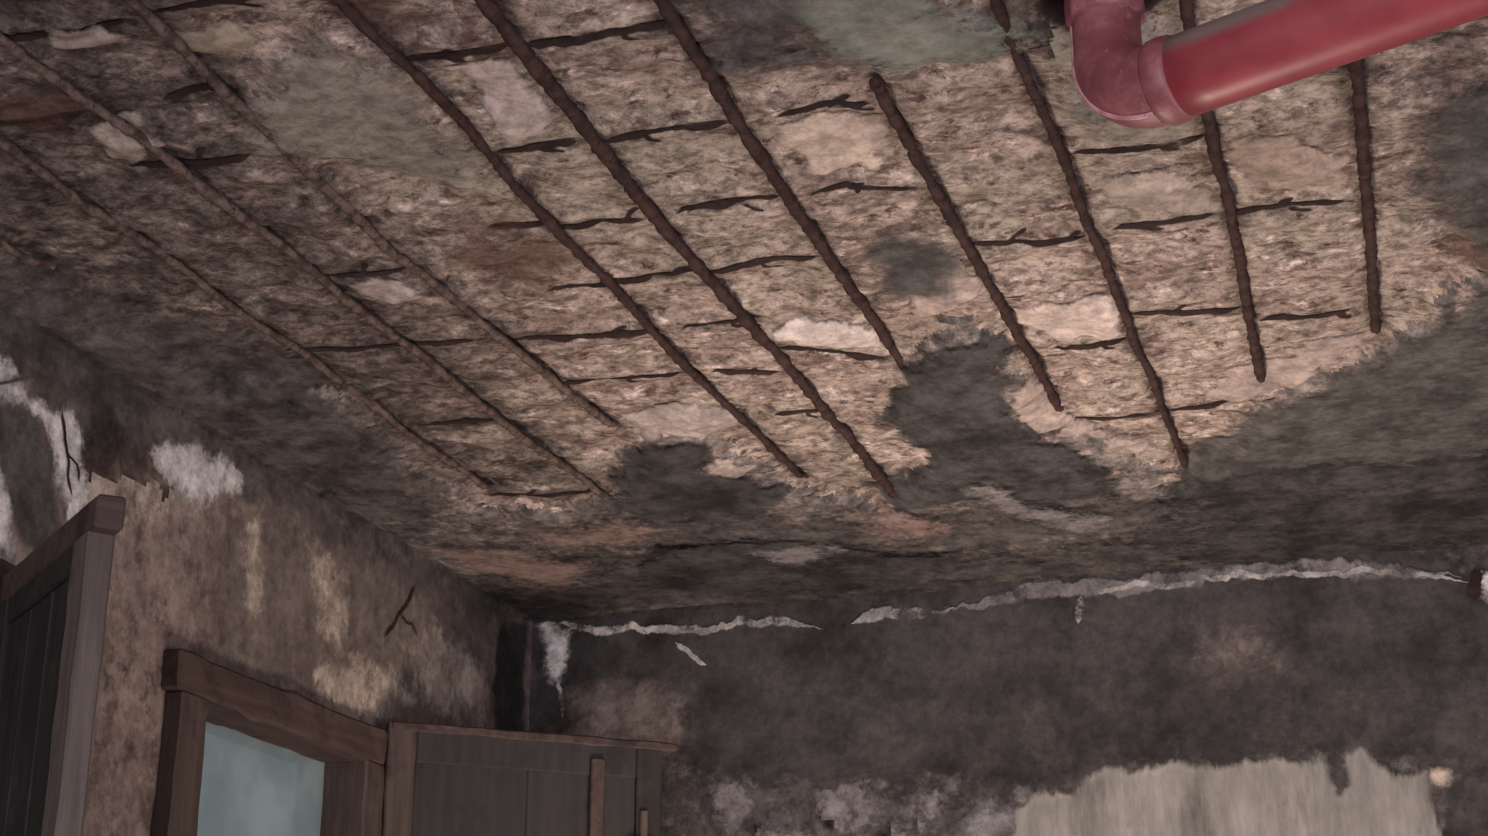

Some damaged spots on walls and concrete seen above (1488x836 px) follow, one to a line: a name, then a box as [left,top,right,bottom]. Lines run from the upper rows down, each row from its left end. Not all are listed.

crack [286,316,885,385]
corrosion [332,0,914,498]
crack [487,183,917,230]
spalling [0,0,1488,540]
corrosion [869,76,1065,412]
corrosion [990,0,1189,470]
corrosion [1200,110,1266,383]
leakage [0,358,188,558]
peeling [441,519,661,590]
leakage [539,621,683,743]
crack [548,557,1466,665]
peeling [959,747,1451,836]